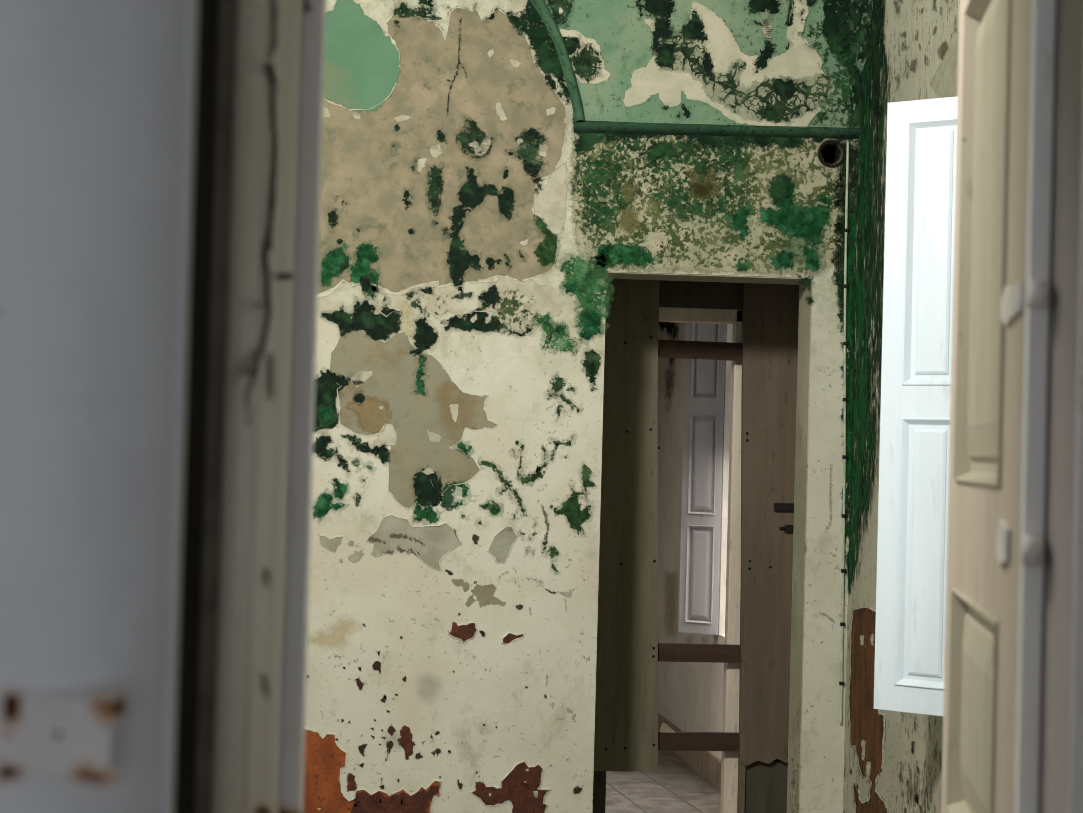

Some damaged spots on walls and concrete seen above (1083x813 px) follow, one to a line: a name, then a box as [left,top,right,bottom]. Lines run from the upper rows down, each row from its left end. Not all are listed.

spalling [317,0,858,336]
water stain [312,0,889,594]
spalling [318,329,530,645]
peeling [356,651,381,691]